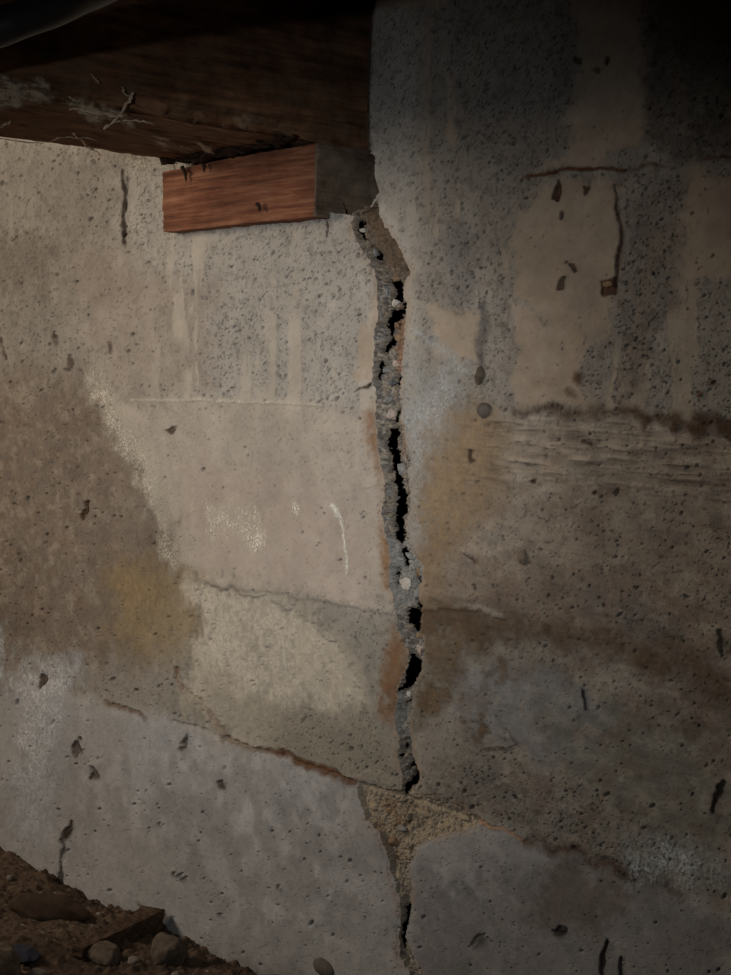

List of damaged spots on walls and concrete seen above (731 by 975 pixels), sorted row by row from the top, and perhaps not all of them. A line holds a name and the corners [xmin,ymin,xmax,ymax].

crack [120,169,128,245]
efflorescence [86,361,180,568]
crack [343,201,425,823]
leakage [402,328,731,715]
crack [175,667,357,785]
crack [389,847,421,975]